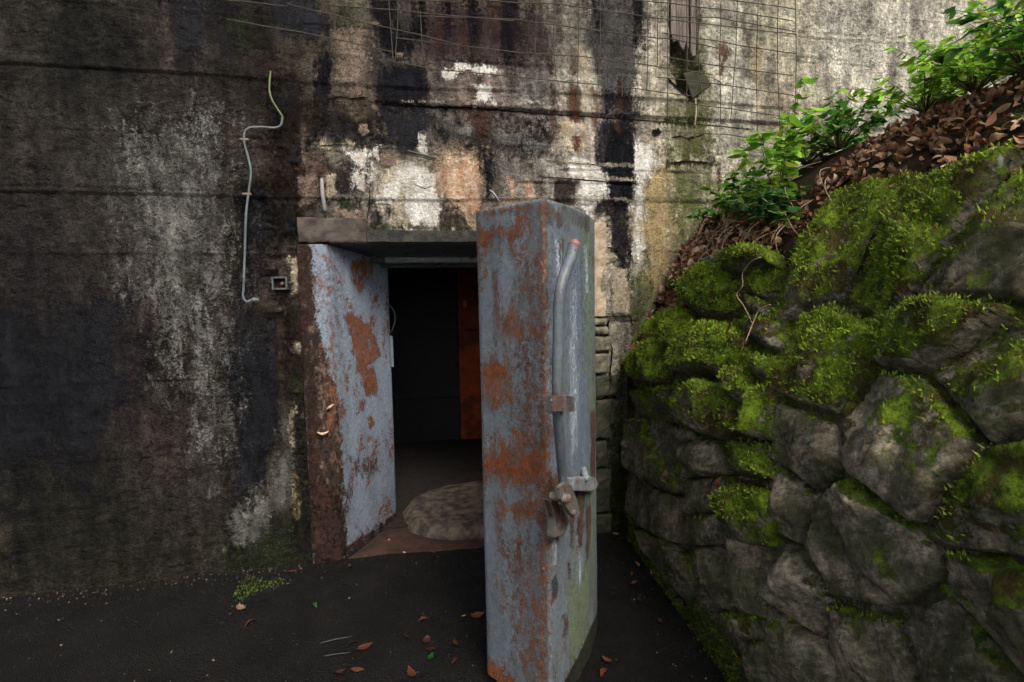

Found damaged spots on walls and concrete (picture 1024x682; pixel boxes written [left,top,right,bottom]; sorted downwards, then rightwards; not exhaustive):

water stain [0,0,312,572]
rust [266,69,397,564]
water stain [262,0,678,303]
rust [476,199,592,682]